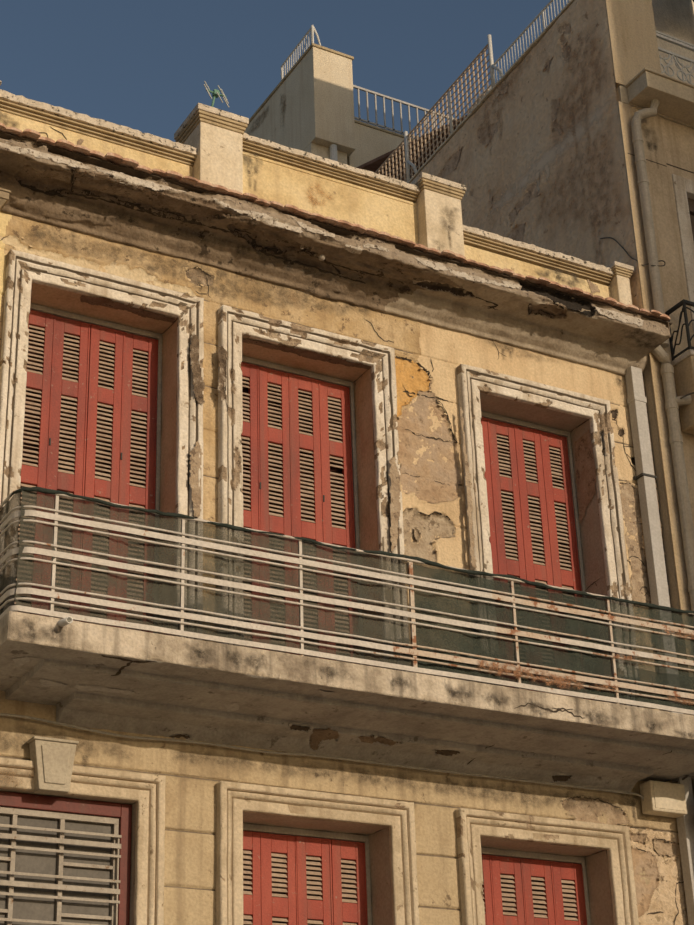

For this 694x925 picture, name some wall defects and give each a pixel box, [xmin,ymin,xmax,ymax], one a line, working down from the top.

crack [21,184,404,284]
spalling [80,295,175,323]
spalling [404,257,644,326]
flaking render [389,355,477,568]
flaking render [574,430,597,524]
flaking render [619,481,651,603]
crack [102,655,156,676]
spalling [288,722,339,750]
crack [514,703,583,719]
flaking render [561,795,689,925]